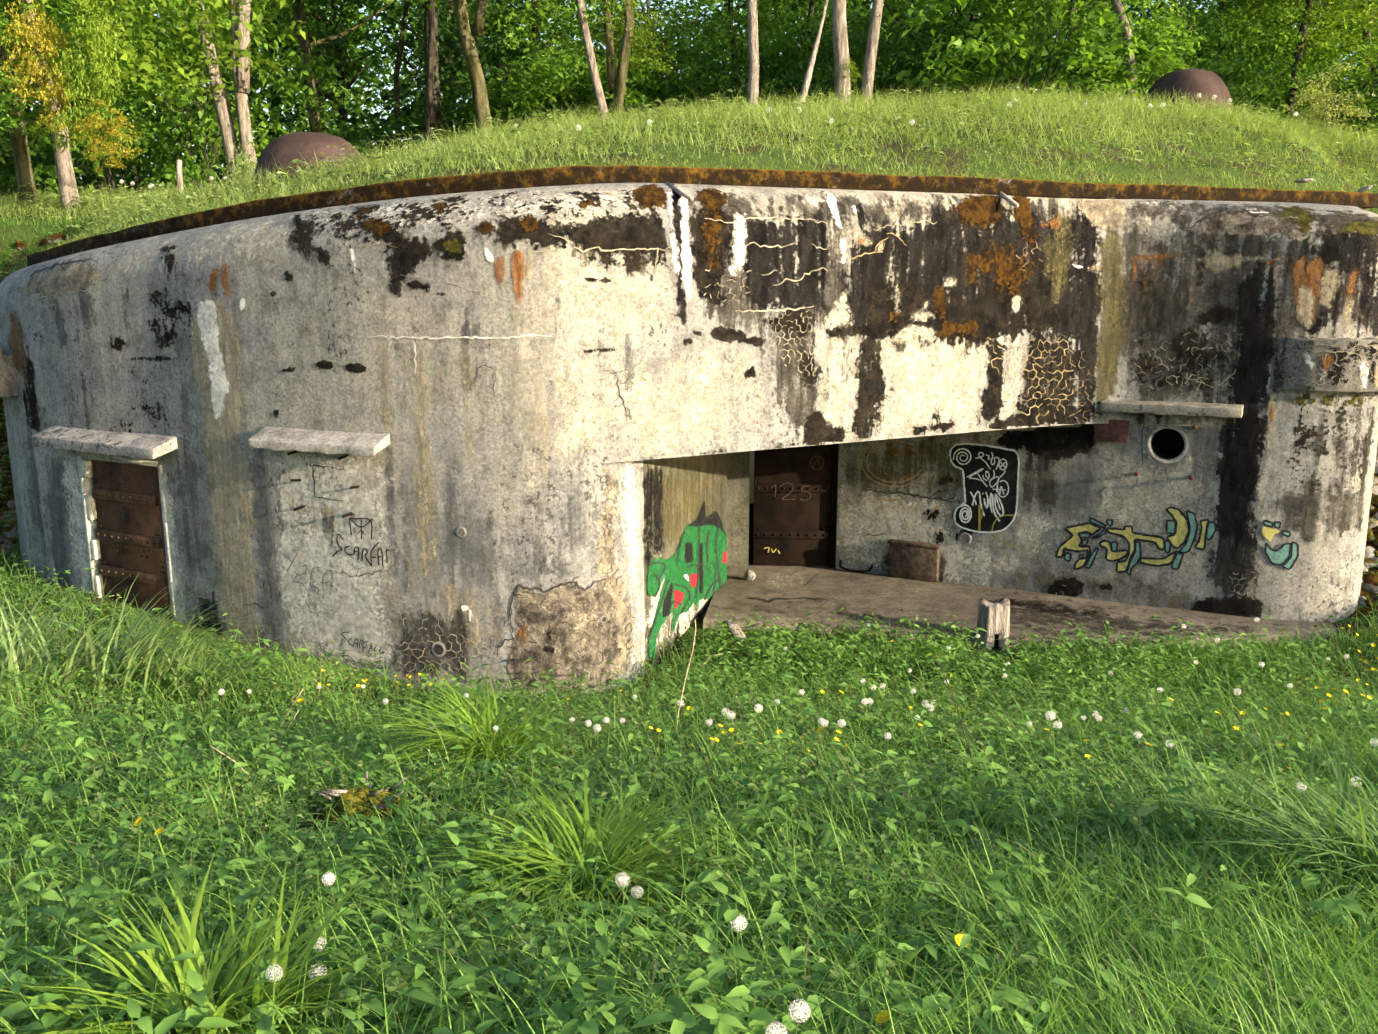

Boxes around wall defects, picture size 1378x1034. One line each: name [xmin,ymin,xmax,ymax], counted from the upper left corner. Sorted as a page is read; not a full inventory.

rust [207,264,230,300]
rust [494,250,525,335]
crack [532,234,675,276]
crack [704,216,937,376]
rust [1041,217,1061,231]
rust [1293,258,1357,330]
crack [372,334,552,393]
crack [984,335,1093,423]
water stain [109,184,1378,685]
spalling [507,462,647,696]
spalling [431,642,446,657]